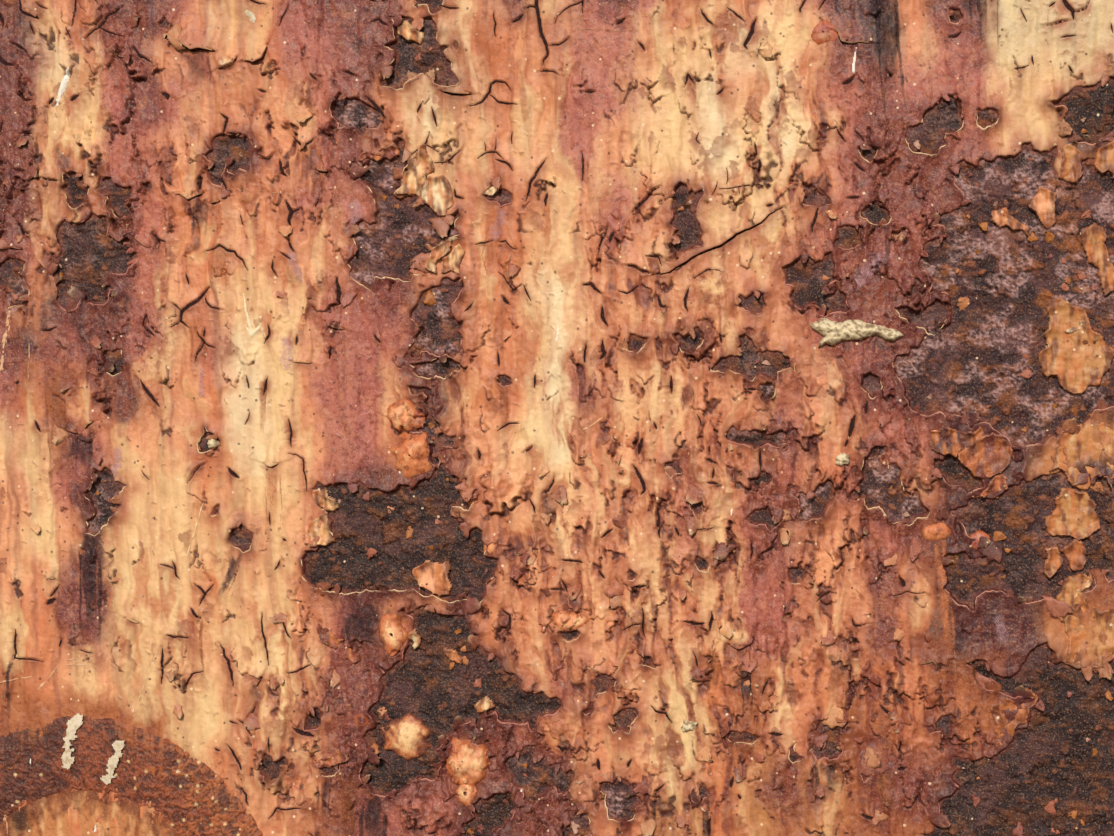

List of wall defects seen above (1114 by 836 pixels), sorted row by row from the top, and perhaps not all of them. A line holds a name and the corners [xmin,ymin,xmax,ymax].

crack [0,0,149,104]
rust [377,0,458,90]
crack [493,0,584,76]
crack [701,7,756,57]
peeling [991,139,1114,236]
crack [583,142,783,363]
rust [892,75,1114,448]
peeling [1038,297,1114,395]
peeling [929,425,1013,499]
peeling [1043,414,1114,669]
rust [301,387,575,836]
rust [916,456,1114,836]